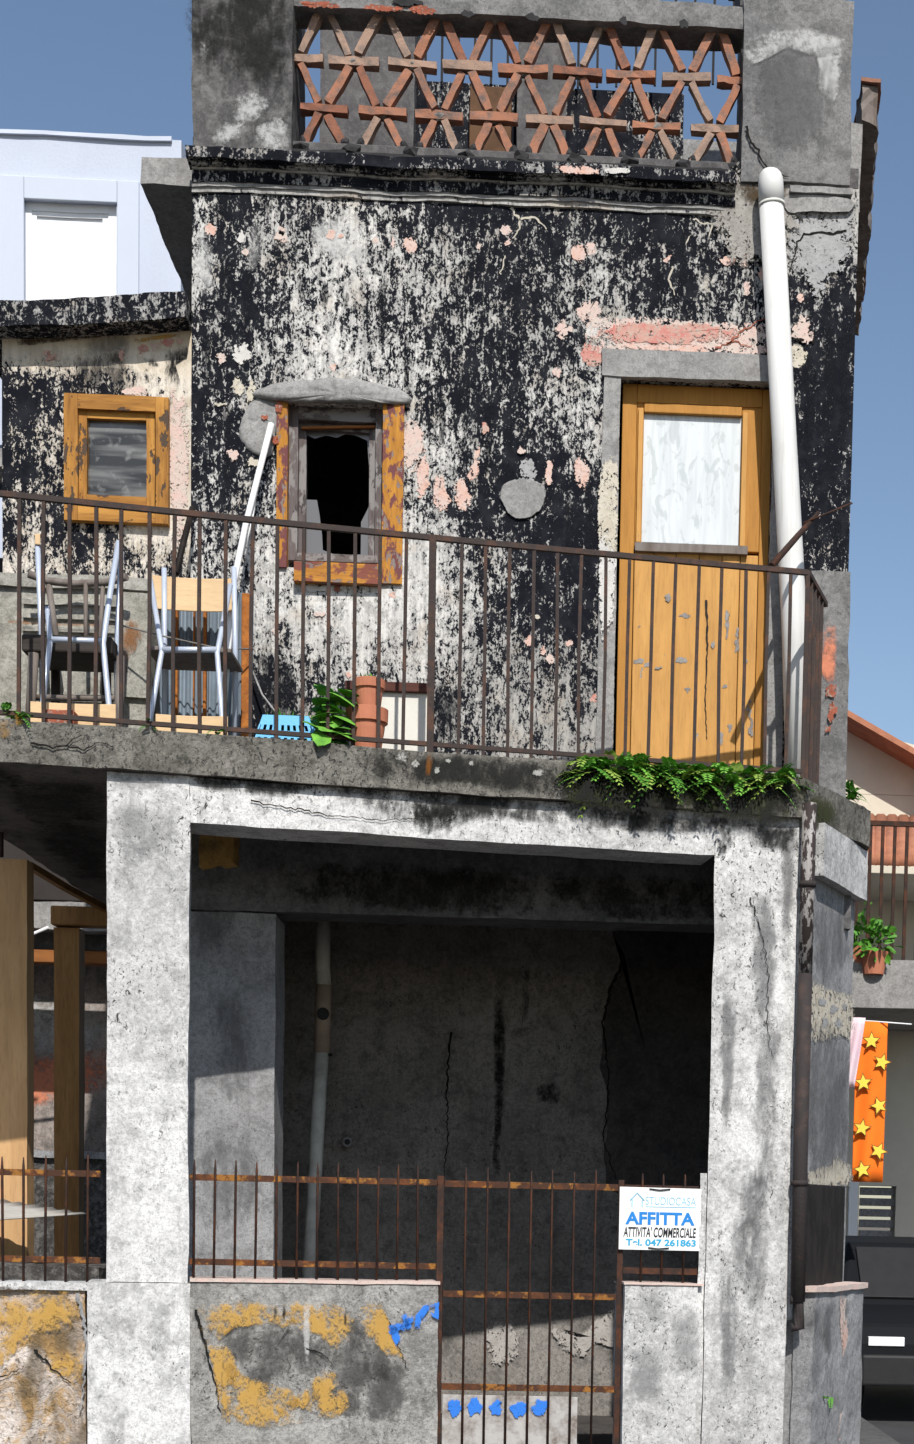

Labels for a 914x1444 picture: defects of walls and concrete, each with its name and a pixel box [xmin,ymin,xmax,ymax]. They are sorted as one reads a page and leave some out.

leakage [189,0,297,83]
peeling [759,33,838,96]
leakage [378,289,386,345]
peeling [555,300,767,367]
peeling [404,420,489,511]
leakage [253,651,307,720]
leakage [194,776,317,794]
leakage [298,687,837,1012]
crack [601,955,625,1179]
leakage [723,1005,733,1115]
crack [194,1309,221,1412]
peeling [200,1301,402,1426]